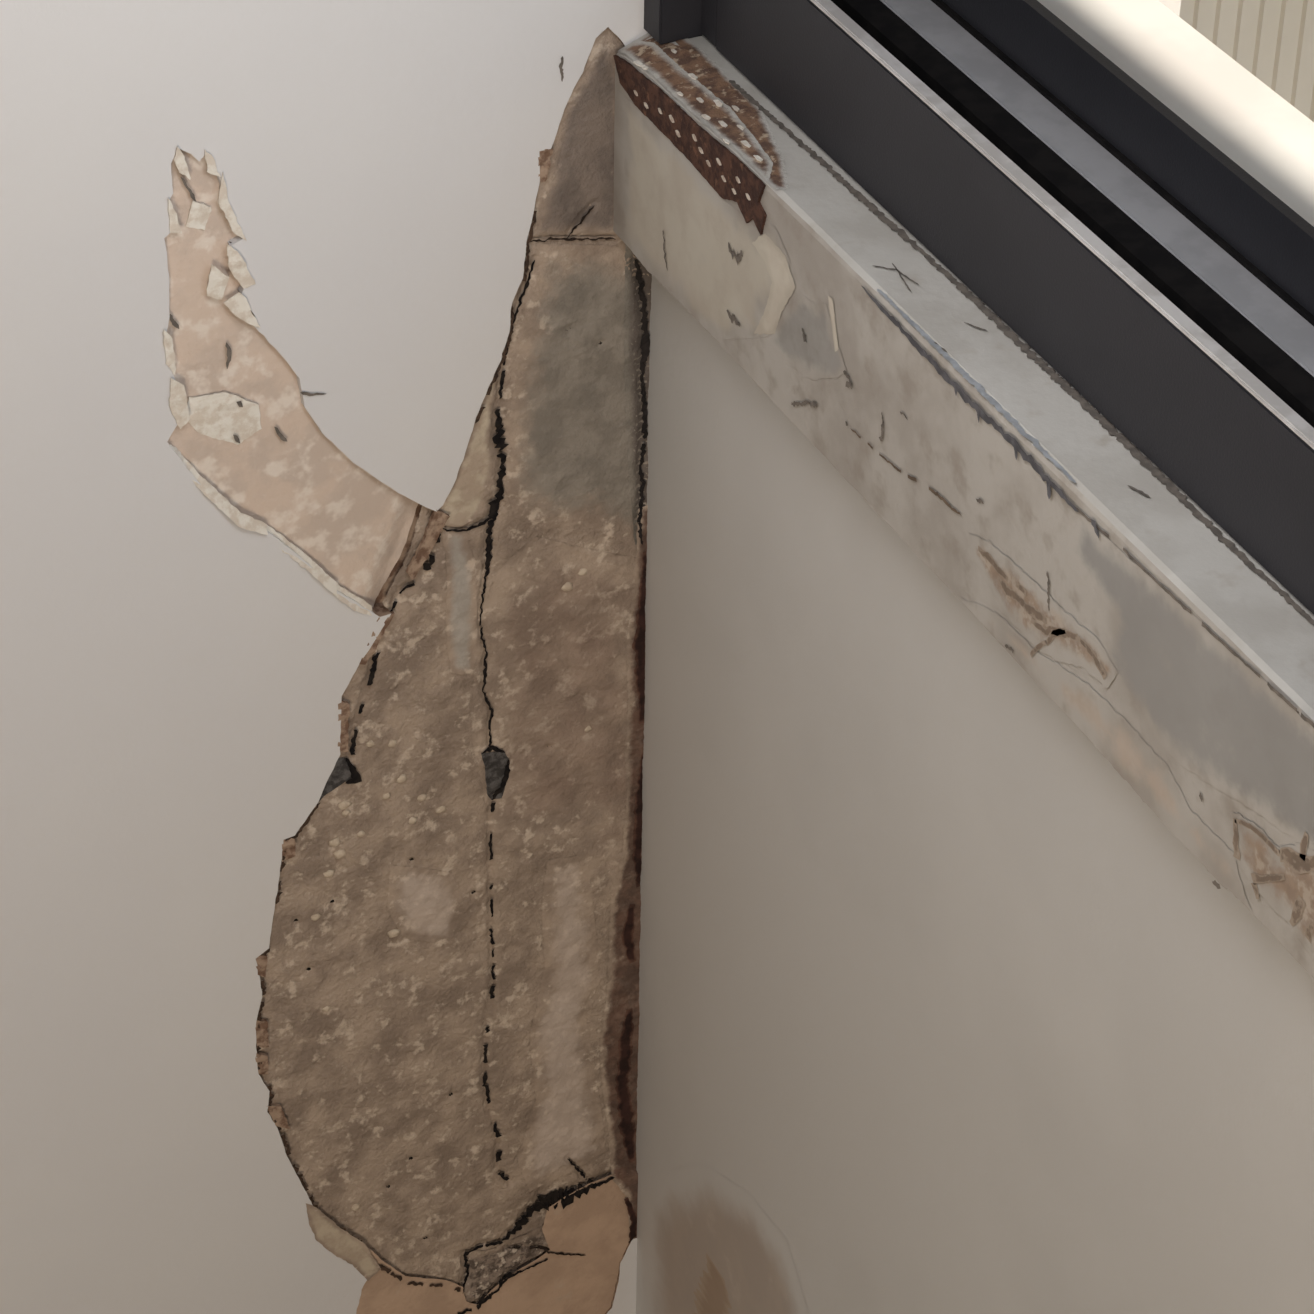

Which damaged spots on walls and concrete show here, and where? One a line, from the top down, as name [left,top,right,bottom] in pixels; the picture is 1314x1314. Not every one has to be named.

corrosion [618,35,790,190]
crack [390,205,650,747]
crack [349,652,381,755]
flaking render [163,28,852,1314]
crack [482,803,509,1181]
crack [457,1159,615,1314]
damp [644,1163,807,1314]